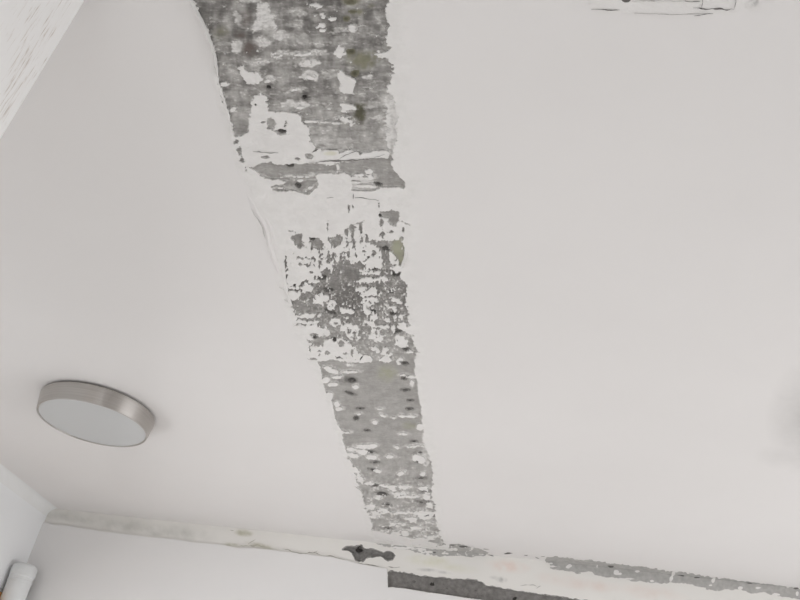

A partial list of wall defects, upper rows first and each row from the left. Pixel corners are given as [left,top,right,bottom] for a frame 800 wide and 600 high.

flaking render [187,0,579,600]
peeling [545,556,800,599]